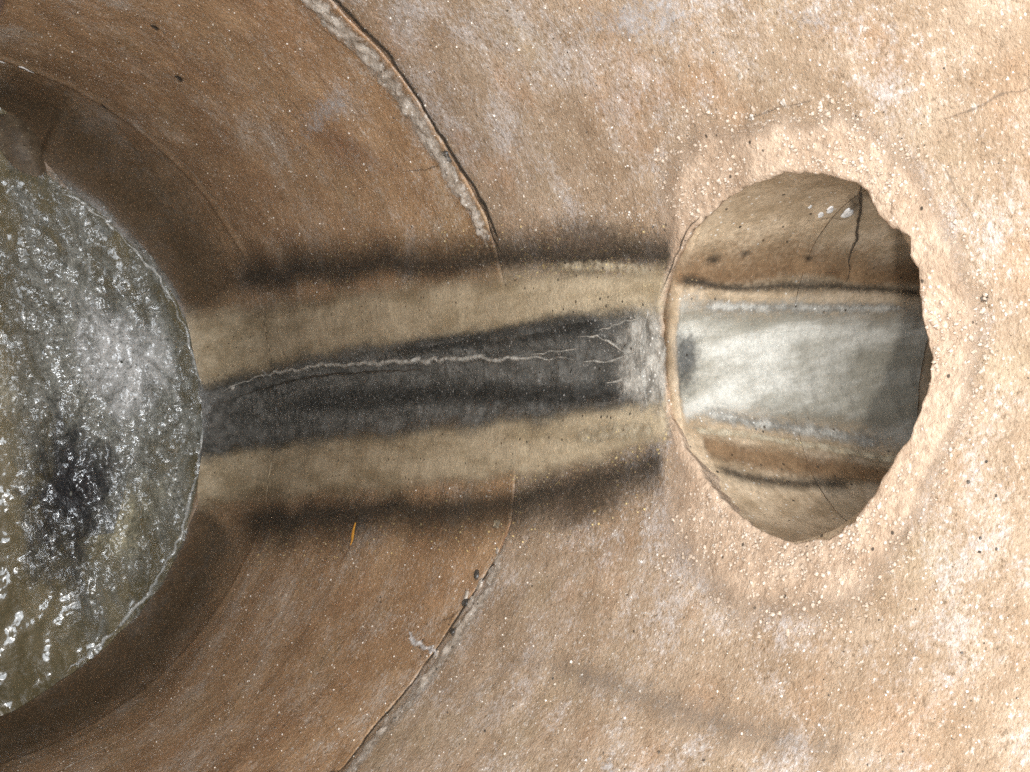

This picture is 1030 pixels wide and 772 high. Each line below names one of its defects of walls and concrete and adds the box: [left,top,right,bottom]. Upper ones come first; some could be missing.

crack [301,0,498,244]
crack [834,187,863,280]